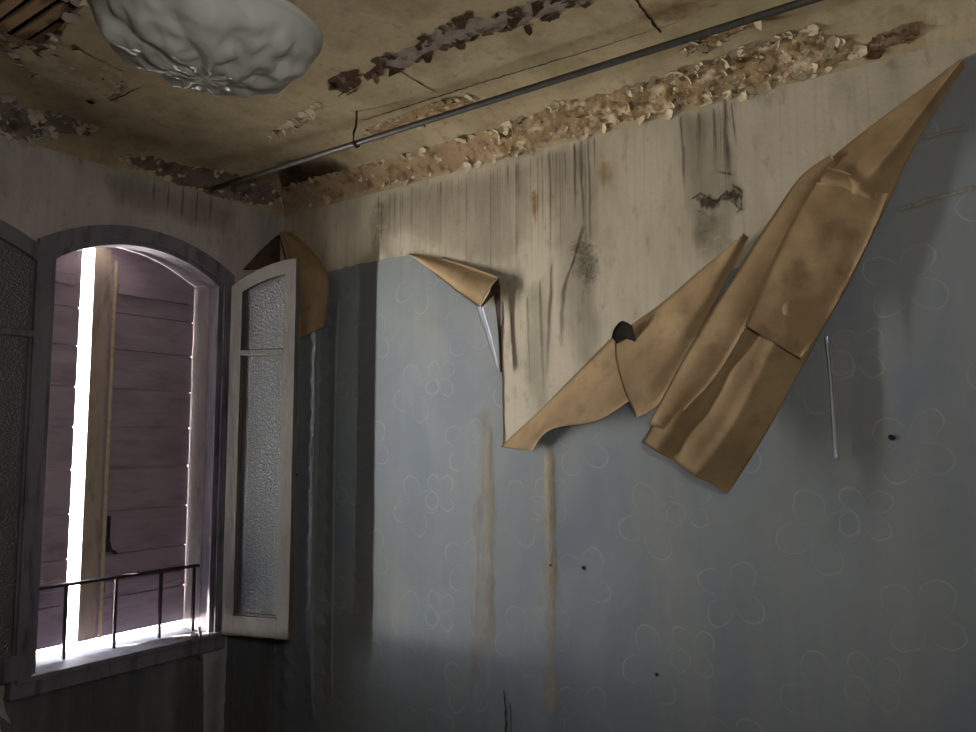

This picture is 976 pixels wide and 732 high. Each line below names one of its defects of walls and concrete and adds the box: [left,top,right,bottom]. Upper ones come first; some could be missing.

peeling [0,0,124,104]
peeling [327,0,591,97]
peeling [0,93,100,148]
peeling [119,20,921,210]